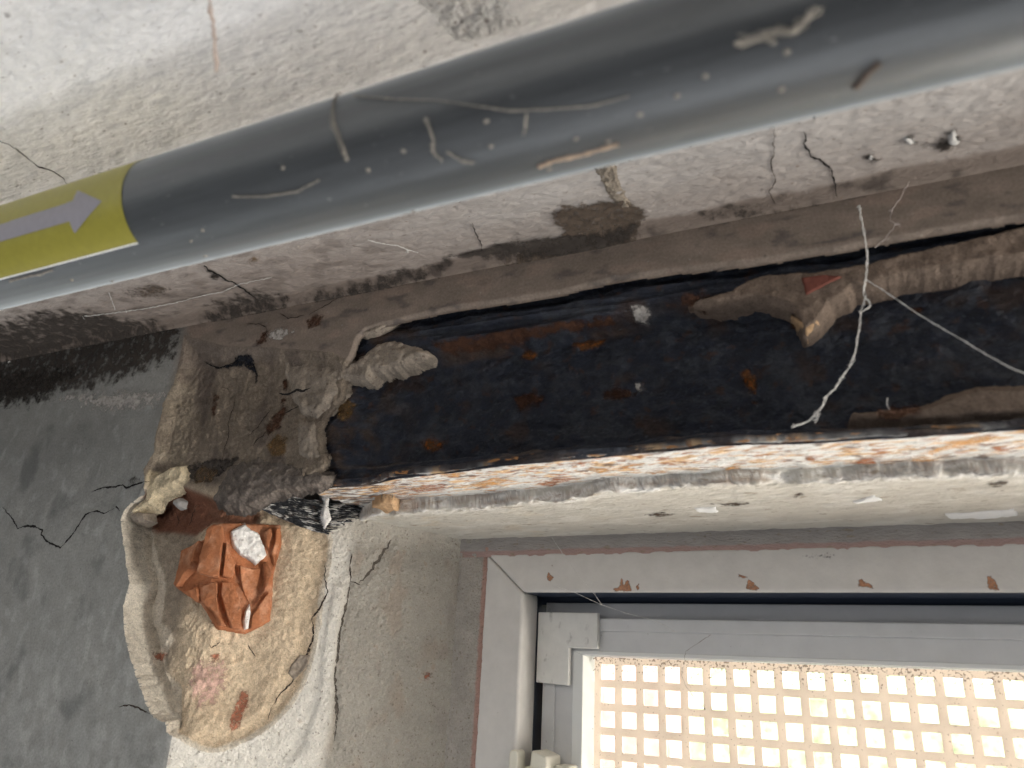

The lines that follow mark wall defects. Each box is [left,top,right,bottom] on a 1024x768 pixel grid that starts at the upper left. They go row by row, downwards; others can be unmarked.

crack [0,141,67,184]
crack [768,127,776,203]
crack [803,132,837,196]
leakage [315,201,647,302]
crack [204,265,338,329]
leakage [0,307,180,411]
rust [434,316,615,360]
rust [912,435,1010,462]
crack [5,477,150,548]
flaking render [121,335,353,753]
rust [369,473,460,501]
crack [334,540,391,740]